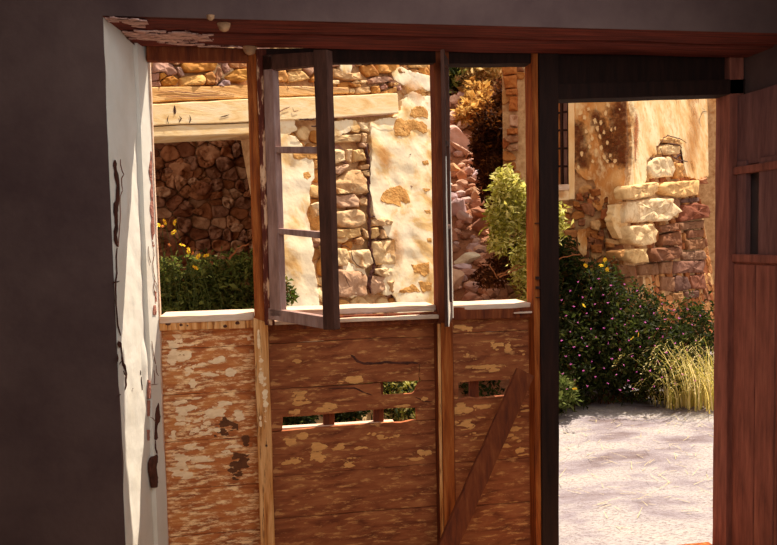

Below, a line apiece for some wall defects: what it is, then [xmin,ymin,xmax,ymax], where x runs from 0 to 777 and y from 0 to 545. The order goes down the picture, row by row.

peeling [105,16,242,48]
flaking render [393,106,428,137]
flaking render [577,102,621,169]
flaking render [380,185,410,207]
crack [344,144,382,294]
crack [112,159,159,397]
crack [351,355,418,365]
peeling [166,334,250,480]
peeling [289,391,338,415]
crack [328,387,371,395]
flaking render [147,380,161,488]
peeling [281,432,368,468]